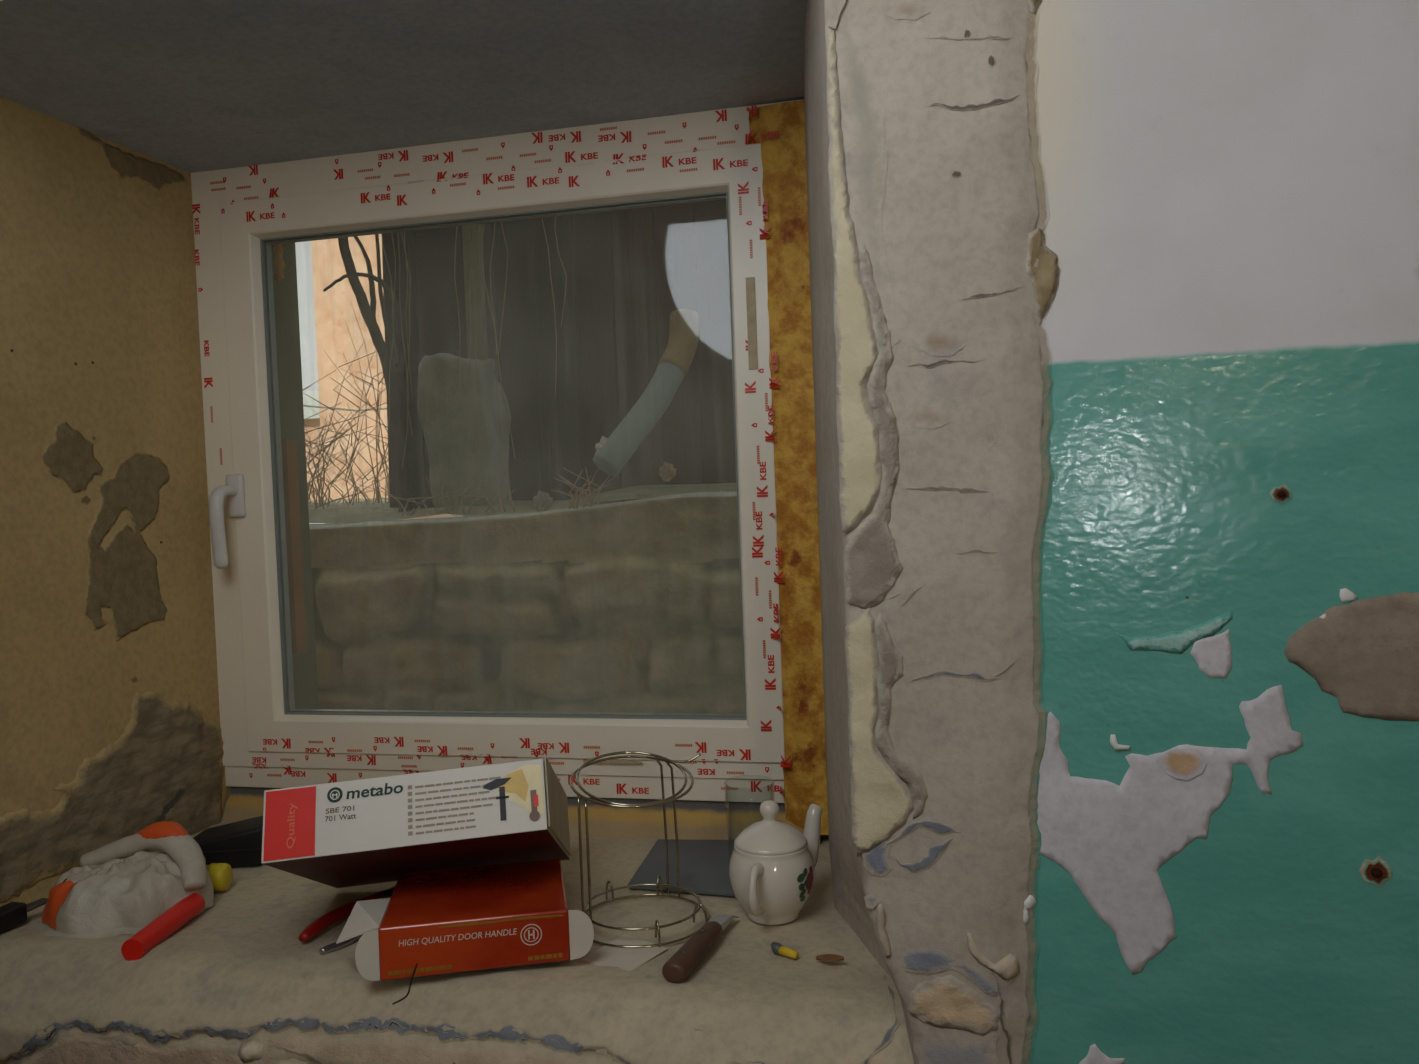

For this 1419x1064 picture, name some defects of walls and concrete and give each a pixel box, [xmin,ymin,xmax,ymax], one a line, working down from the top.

spalling [1025,227,1060,325]
spalling [40,422,170,642]
crack [907,9,1054,1064]
rust [1268,482,1293,507]
peeling [1117,611,1232,678]
spalling [1284,588,1419,721]
spalling [0,675,224,903]
peeling [1037,685,1303,975]
rust [1358,855,1393,890]
crack [0,1015,639,1064]
crack [860,973,899,1064]
spalling [1079,1044,1126,1064]